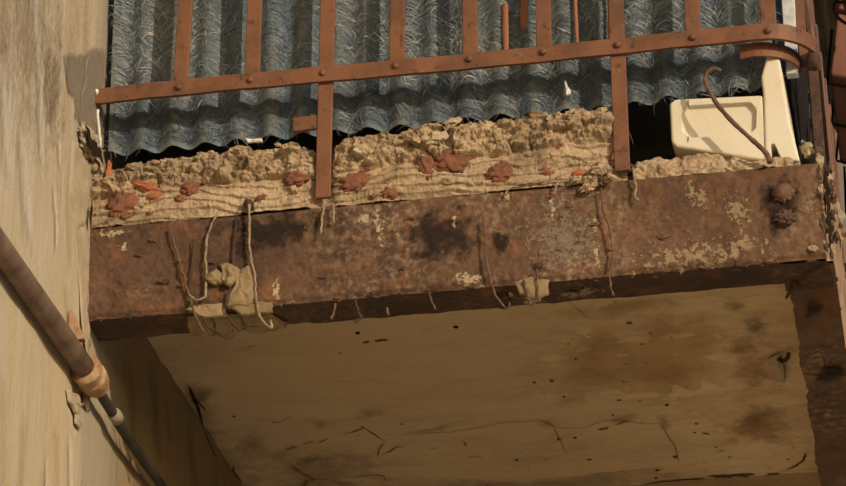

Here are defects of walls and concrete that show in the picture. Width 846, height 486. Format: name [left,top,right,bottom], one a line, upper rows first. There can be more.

spalling [703,67,773,164]
spalling [65,47,127,354]
rust [231,210,324,255]
rust [408,207,479,260]
rust [493,232,508,252]
rust [762,186,797,231]
crack [286,418,806,486]